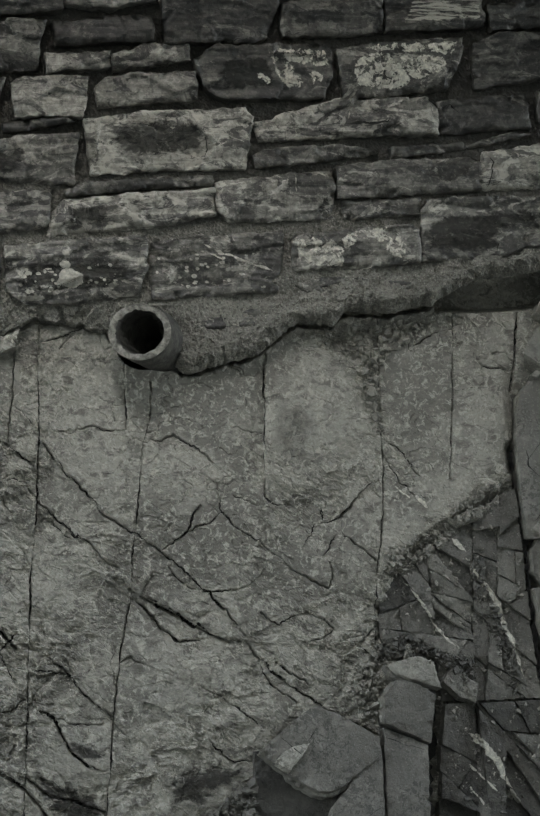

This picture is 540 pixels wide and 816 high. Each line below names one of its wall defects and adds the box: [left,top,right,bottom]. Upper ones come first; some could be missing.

crack [477,317,517,390]
crack [508,443,540,476]
crack [0,356,412,816]
crack [518,515,540,678]
crack [353,661,438,816]
spalling [381,644,479,706]